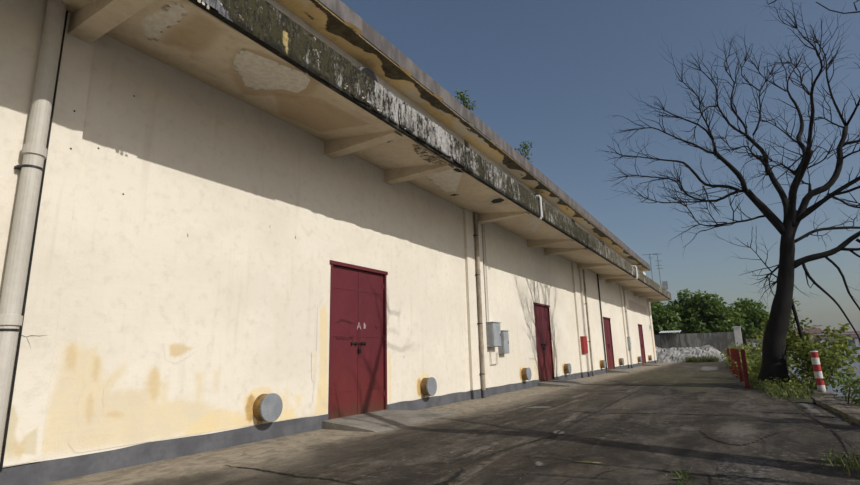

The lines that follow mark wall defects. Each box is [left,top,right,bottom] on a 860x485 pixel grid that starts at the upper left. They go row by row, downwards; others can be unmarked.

peeling [229,46,323,93]
peeling [342,75,479,196]
leakage [0,326,240,467]
leakage [269,298,329,421]
crack [434,467,463,485]